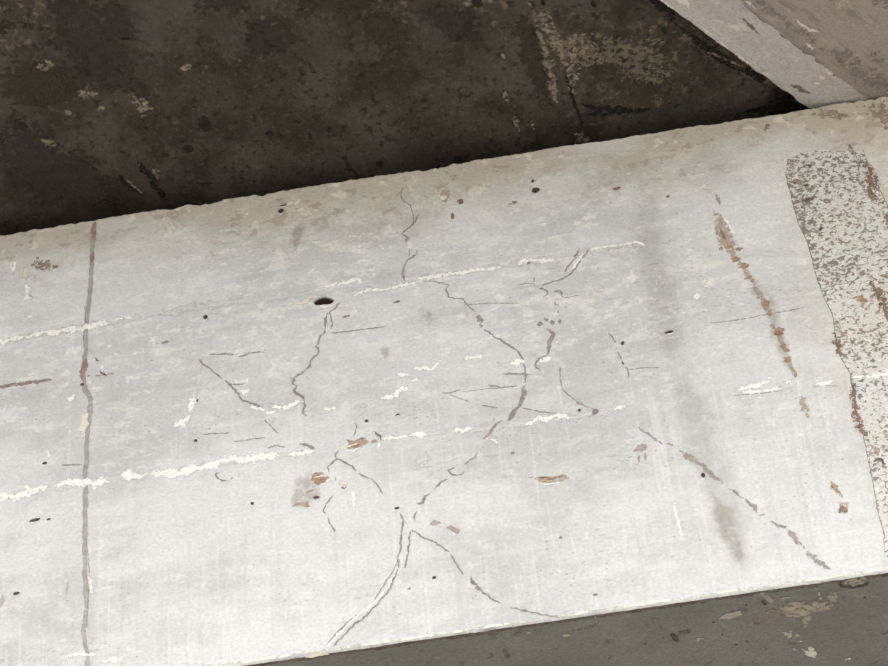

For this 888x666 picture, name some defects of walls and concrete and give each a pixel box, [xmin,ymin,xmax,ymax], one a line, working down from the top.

rust [848,144,888,228]
crack [290,302,339,416]
crack [432,249,590,444]
rust [714,198,797,378]
rust [849,278,888,332]
crack [79,222,113,666]
spalling [293,472,357,508]
spalling [340,432,381,452]
crack [305,451,559,658]
crack [645,432,830,570]
rust [831,481,848,513]
rust [849,385,886,465]